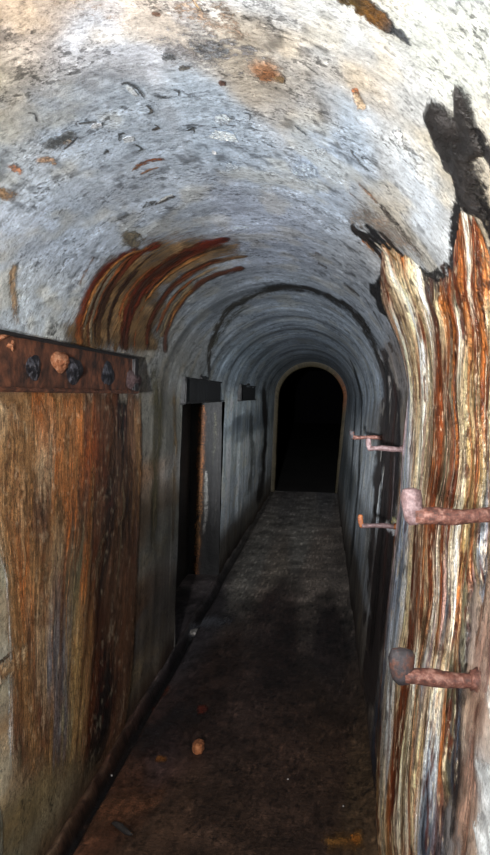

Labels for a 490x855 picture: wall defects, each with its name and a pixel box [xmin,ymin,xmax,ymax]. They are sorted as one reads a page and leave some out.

water stain [148,0,268,76]
rust [8,264,19,323]
rust [63,232,248,354]
water stain [351,224,403,261]
water stain [379,205,420,254]
water stain [418,86,490,282]
rust [347,184,490,855]
rust [0,388,142,788]